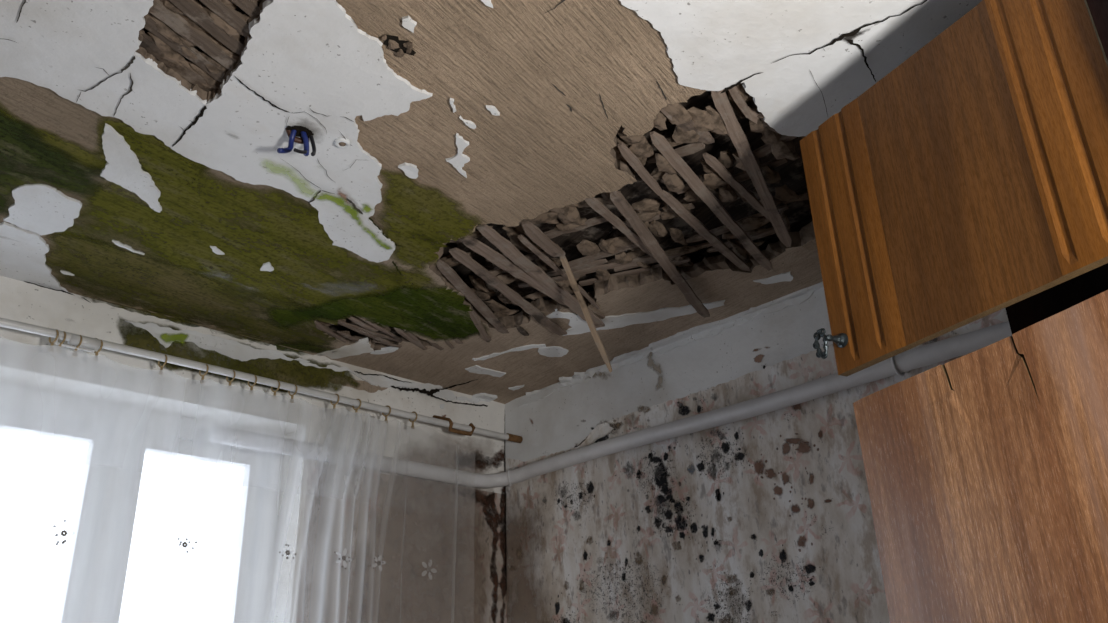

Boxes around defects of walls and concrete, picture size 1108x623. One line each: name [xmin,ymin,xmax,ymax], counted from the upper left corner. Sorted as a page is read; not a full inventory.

crack [76,56,135,115]
crack [172,106,207,147]
flaking render [336,0,707,237]
crack [721,0,927,115]
flaking render [0,77,823,409]
mould [677,389,717,415]
leakage [356,429,833,623]